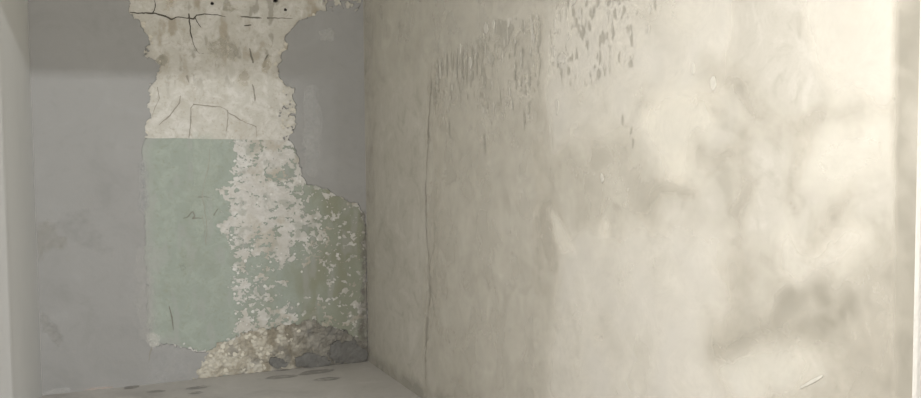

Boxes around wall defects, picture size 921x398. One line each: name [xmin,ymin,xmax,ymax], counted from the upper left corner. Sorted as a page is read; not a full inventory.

crack [152,75,257,136]
crack [130,0,292,54]
crack [249,48,268,100]
water stain [548,0,630,147]
peeling [129,0,367,380]
crack [425,68,435,387]
water stain [771,261,898,398]